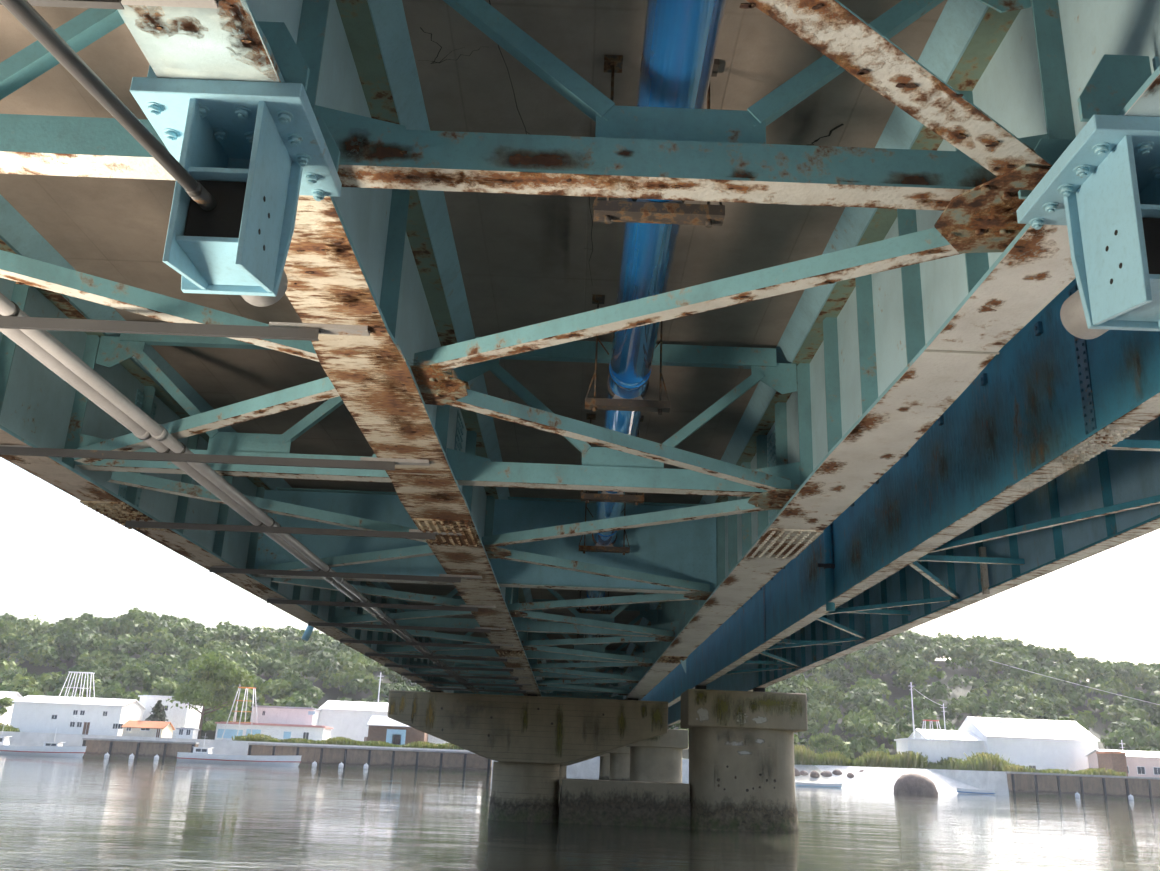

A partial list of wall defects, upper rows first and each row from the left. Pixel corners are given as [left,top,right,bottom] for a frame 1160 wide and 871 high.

rust [134,6,201,34]
rust [219,0,271,65]
rust [784,0,843,21]
rust [889,75,919,93]
rust [337,134,699,190]
rust [721,171,766,194]
rust [937,125,1024,187]
rust [918,199,1059,266]
rust [268,223,539,580]
rust [843,414,884,442]
rust [746,459,846,561]
leakage [389,697,434,726]